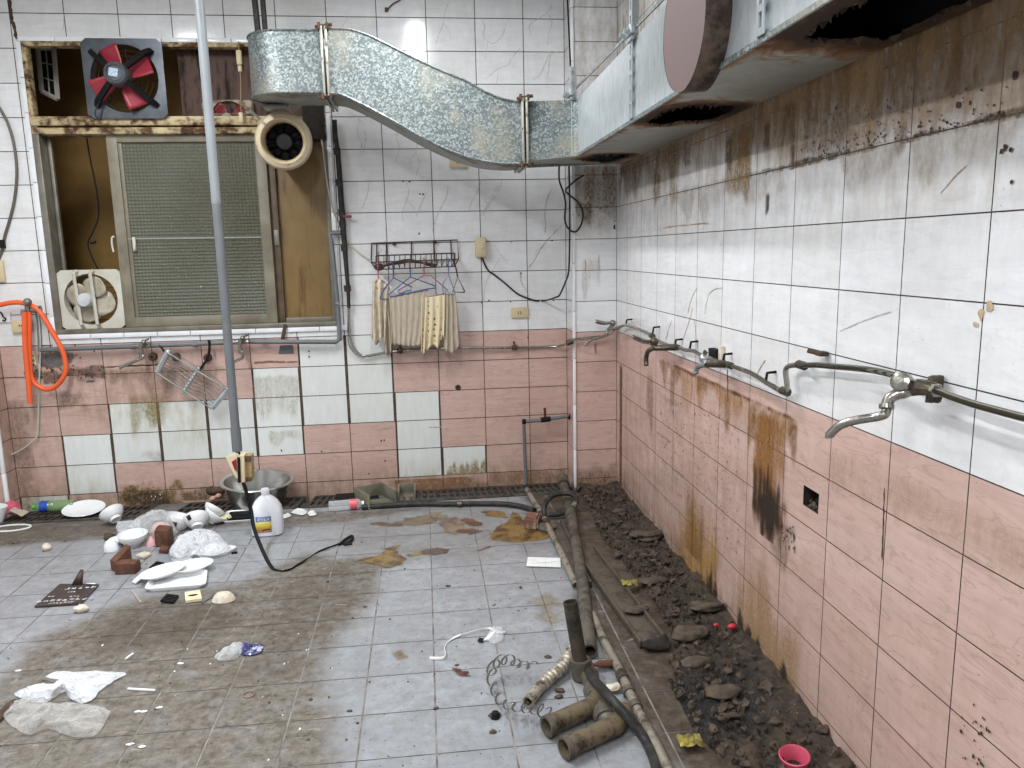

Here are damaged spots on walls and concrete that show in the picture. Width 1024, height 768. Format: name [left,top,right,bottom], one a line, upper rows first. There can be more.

water stain [726,86,1024,192]
mould [119,480,224,506]
corrosion [659,360,796,598]